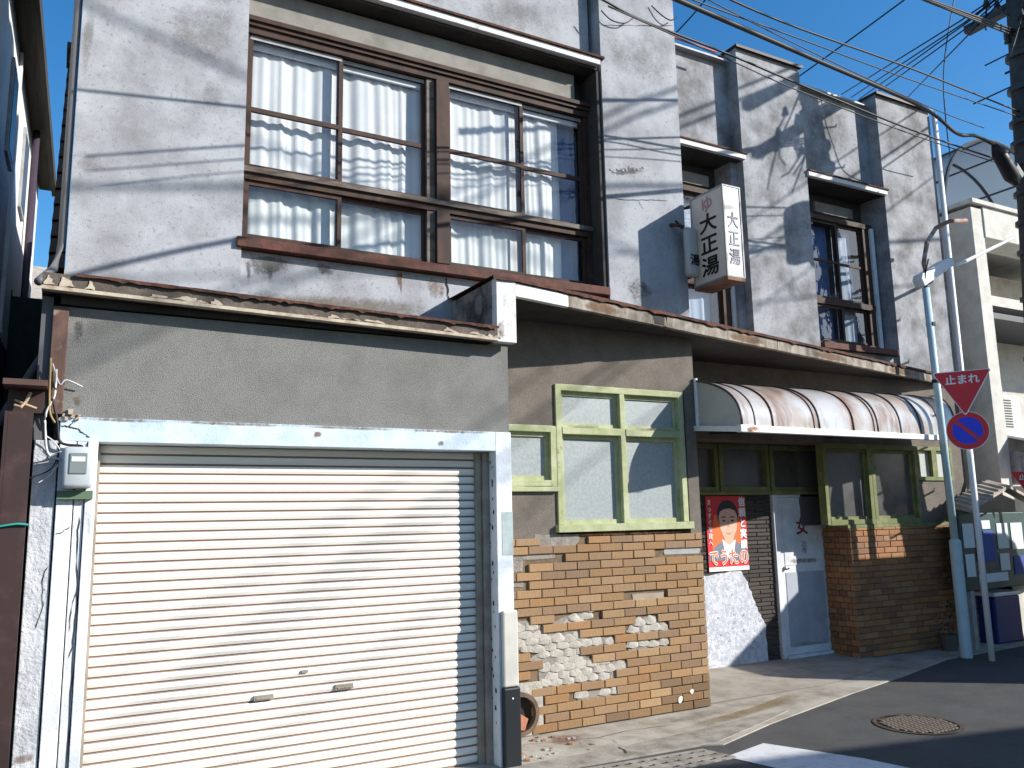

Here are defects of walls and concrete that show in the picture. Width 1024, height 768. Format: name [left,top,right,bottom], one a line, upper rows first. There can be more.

peeling [44,275,95,291]
peeling [150,294,223,305]
peeling [308,314,385,324]
spalling [518,611,669,700]